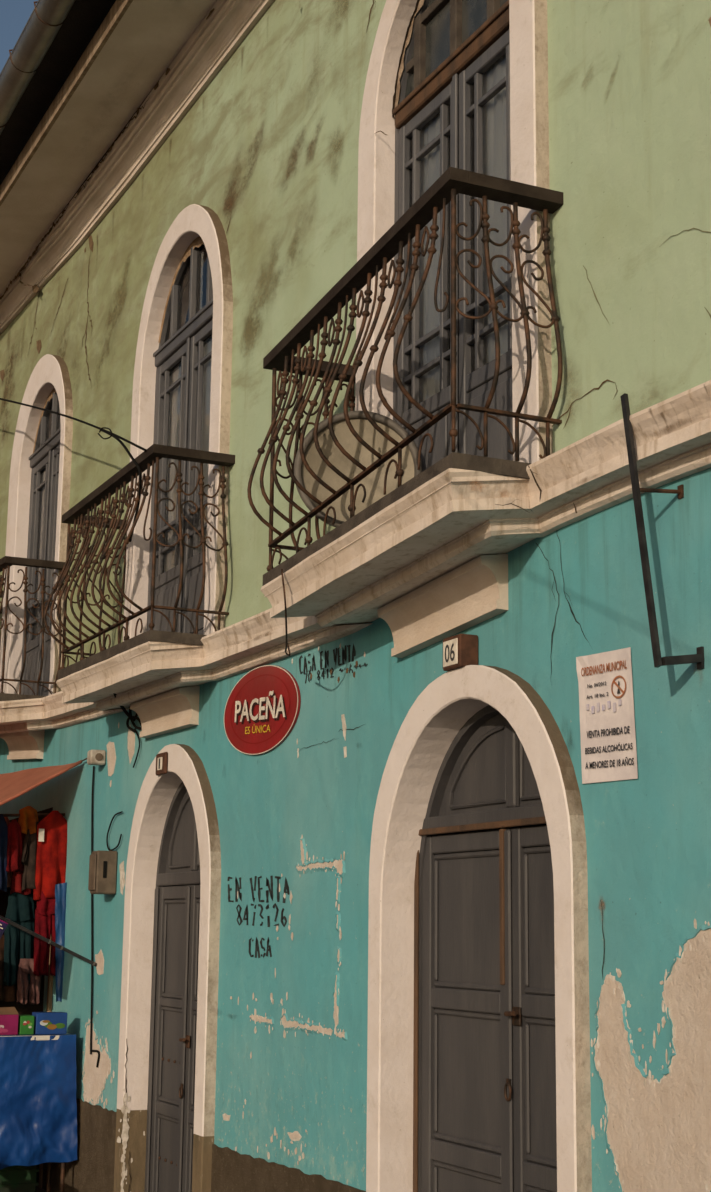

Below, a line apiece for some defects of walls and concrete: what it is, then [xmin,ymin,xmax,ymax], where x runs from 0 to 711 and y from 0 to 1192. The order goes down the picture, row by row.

crack [0,100,148,381]
crack [496,465,542,512]
crack [536,535,588,680]
peeling [95,950,104,975]
peeling [230,835,348,1041]
peeling [81,1011,133,1192]
peeling [591,919,711,1192]